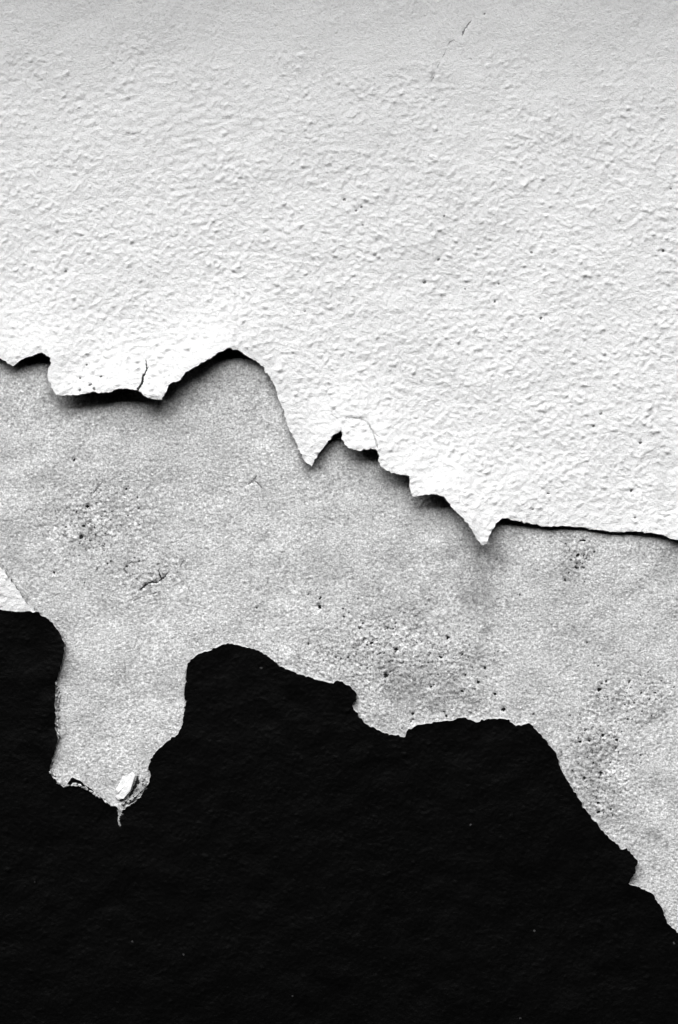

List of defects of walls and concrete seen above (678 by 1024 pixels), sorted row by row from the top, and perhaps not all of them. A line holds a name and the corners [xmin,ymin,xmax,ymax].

crack [137,360,149,391]
peeling [0,348,678,944]